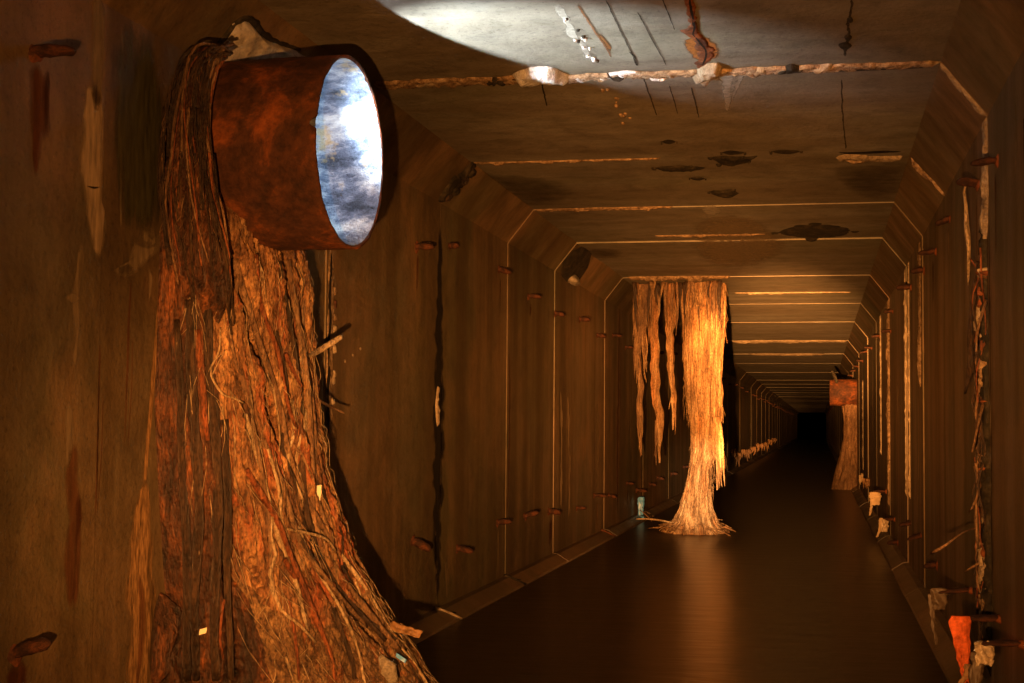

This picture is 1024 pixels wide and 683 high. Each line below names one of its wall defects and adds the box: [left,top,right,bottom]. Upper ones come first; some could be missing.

rust [32,70,50,171]
peeling [607,71,647,82]
crack [578,0,718,117]
crack [838,0,853,148]
peeling [978,169,988,238]
crack [433,233,463,620]